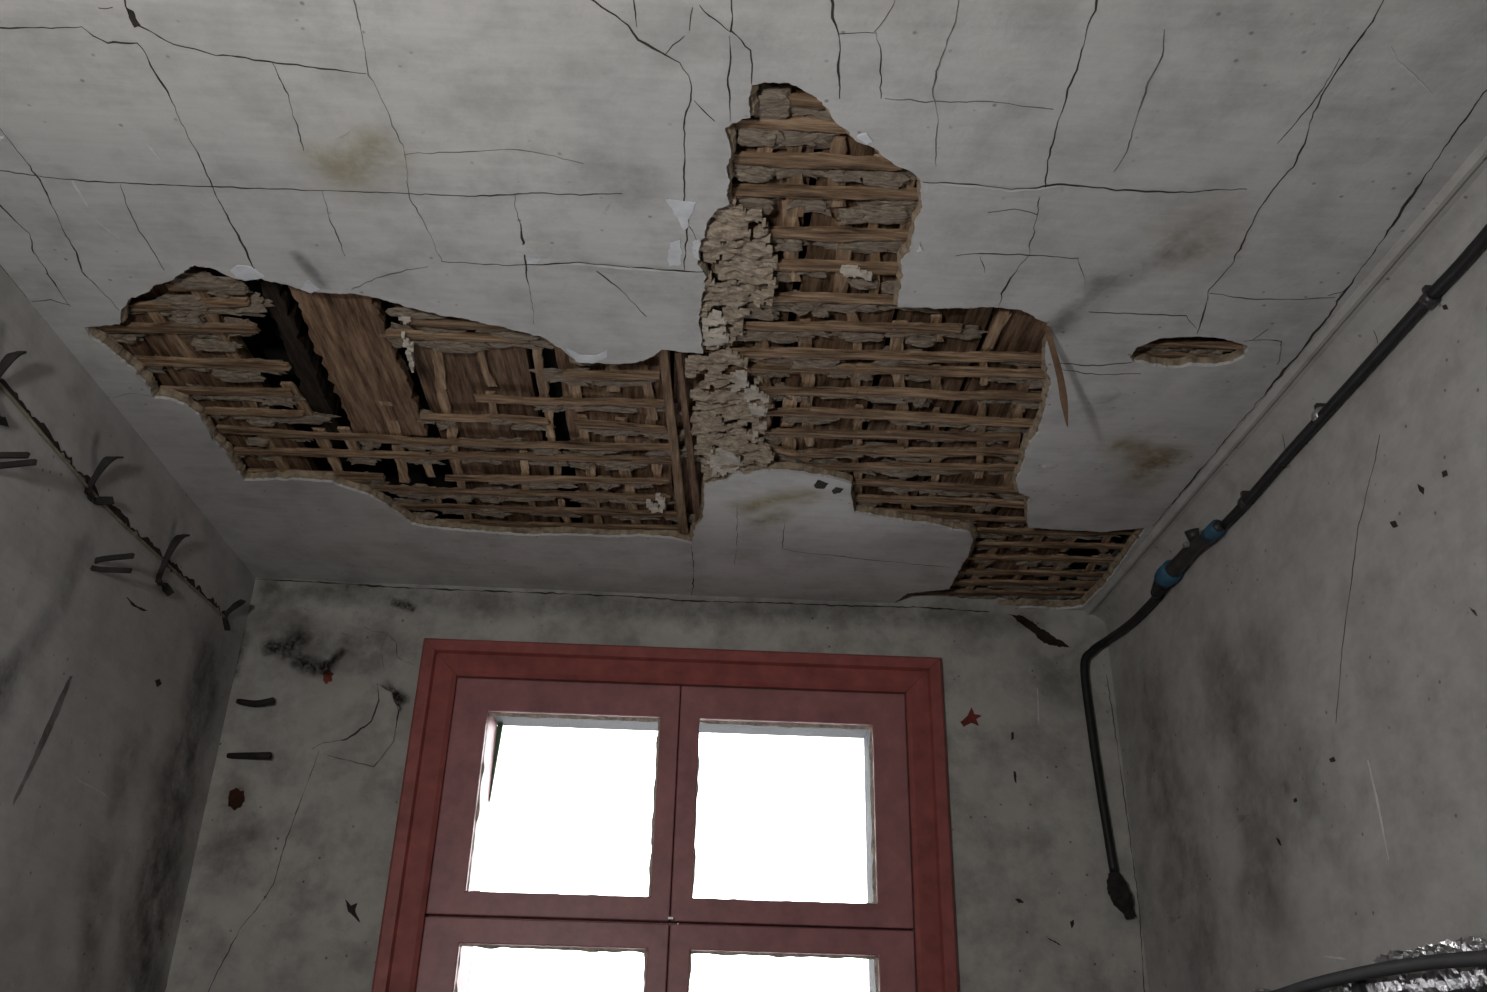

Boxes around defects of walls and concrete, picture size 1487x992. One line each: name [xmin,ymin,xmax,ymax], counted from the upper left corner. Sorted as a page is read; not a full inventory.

crack [0,0,753,323]
flaking render [87,84,978,587]
flaking render [1012,323,1051,525]
crack [830,0,1487,526]
flaking render [1131,344,1247,366]
flaking render [998,528,1144,647]